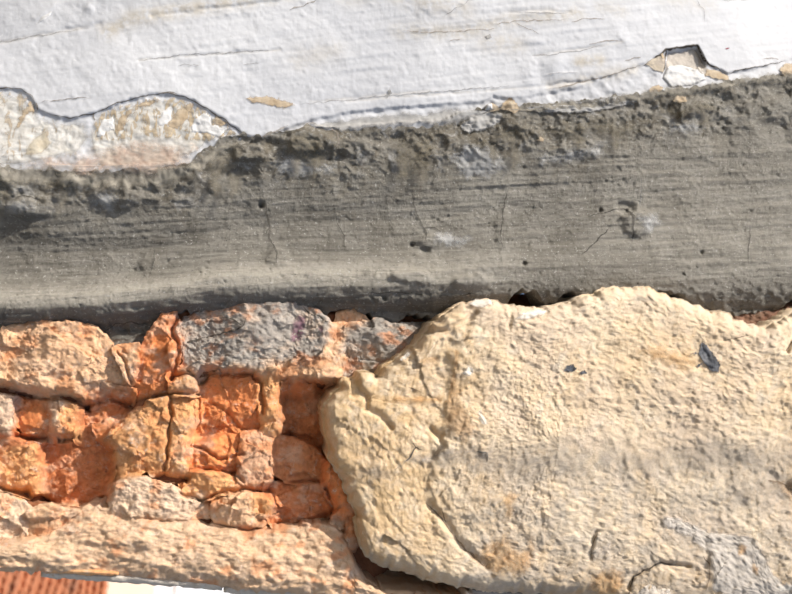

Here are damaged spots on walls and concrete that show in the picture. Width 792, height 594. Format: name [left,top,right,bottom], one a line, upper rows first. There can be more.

crack [408,3,599,41]
crack [544,40,782,89]
spalling [646,49,729,92]
peeling [0,92,235,175]